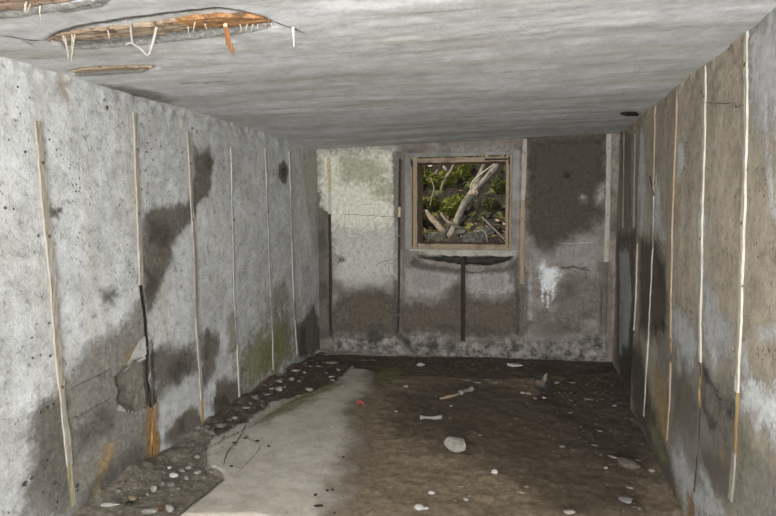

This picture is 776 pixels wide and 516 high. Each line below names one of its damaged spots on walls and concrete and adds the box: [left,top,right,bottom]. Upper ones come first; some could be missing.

spalling [0,0,110,19]
spalling [46,7,272,76]
leakage [22,147,241,516]
spalling [115,337,153,413]
rust [145,401,160,459]
leakage [297,152,546,358]
leakage [527,134,606,342]
leakage [619,240,776,516]